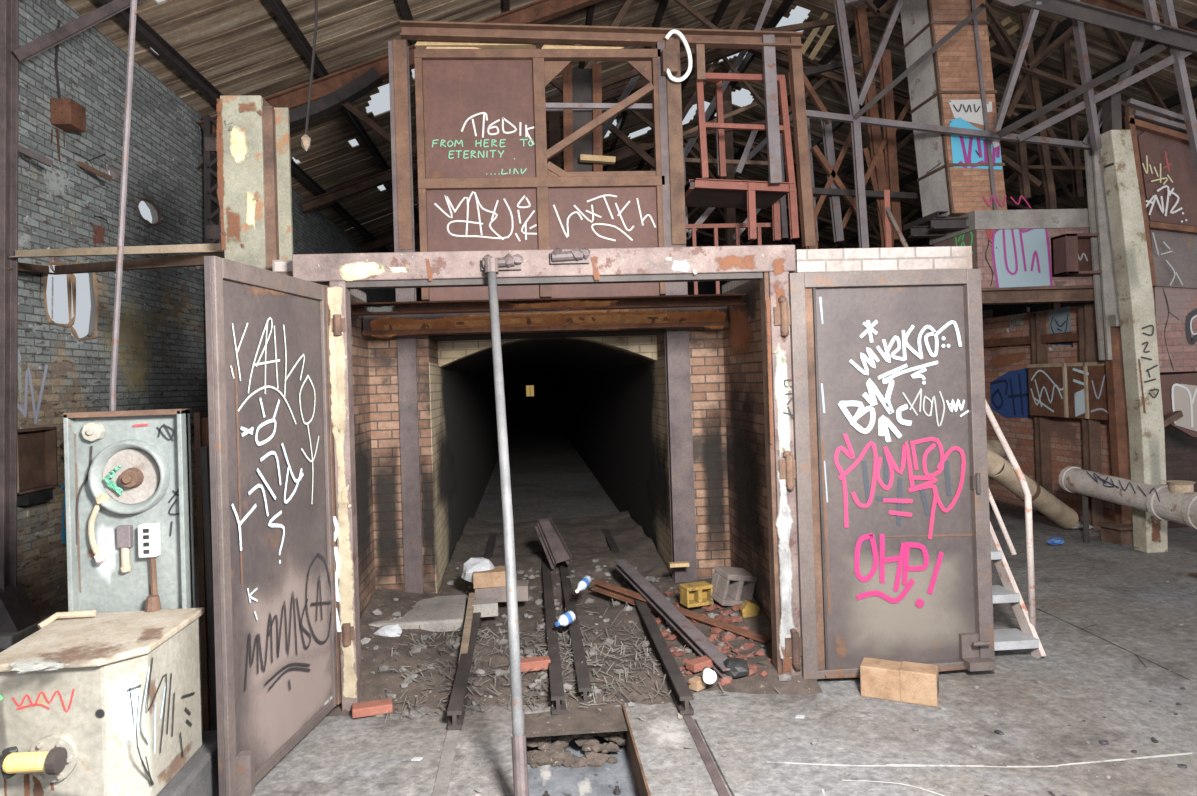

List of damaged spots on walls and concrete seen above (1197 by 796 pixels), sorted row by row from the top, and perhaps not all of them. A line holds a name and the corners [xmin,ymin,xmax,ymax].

peeling [225,118,251,162]
peeling [246,191,259,227]
rust [370,300,727,338]
peeling [773,347,791,453]
peeling [248,259,409,760]
leakage [422,470,436,567]
peeling [776,472,795,659]